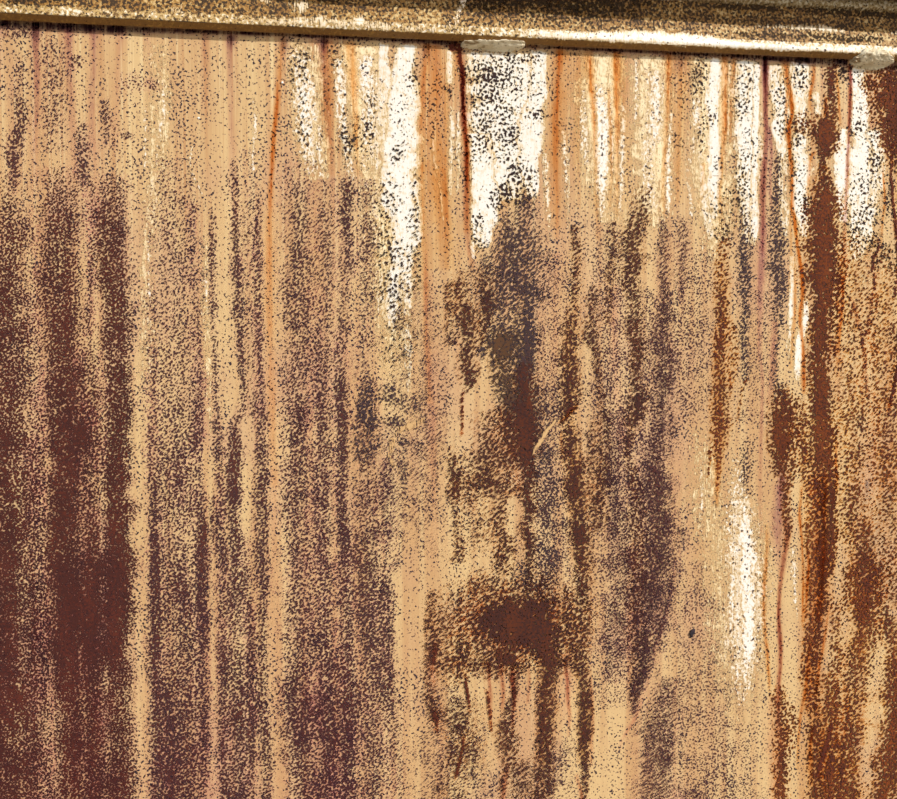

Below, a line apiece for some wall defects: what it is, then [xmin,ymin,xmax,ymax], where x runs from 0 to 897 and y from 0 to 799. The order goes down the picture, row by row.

corrosion [456,0,658,24]
corrosion [683,0,897,19]
corrosion [735,30,883,42]
corrosion [681,52,717,153]
corrosion [763,685,800,799]